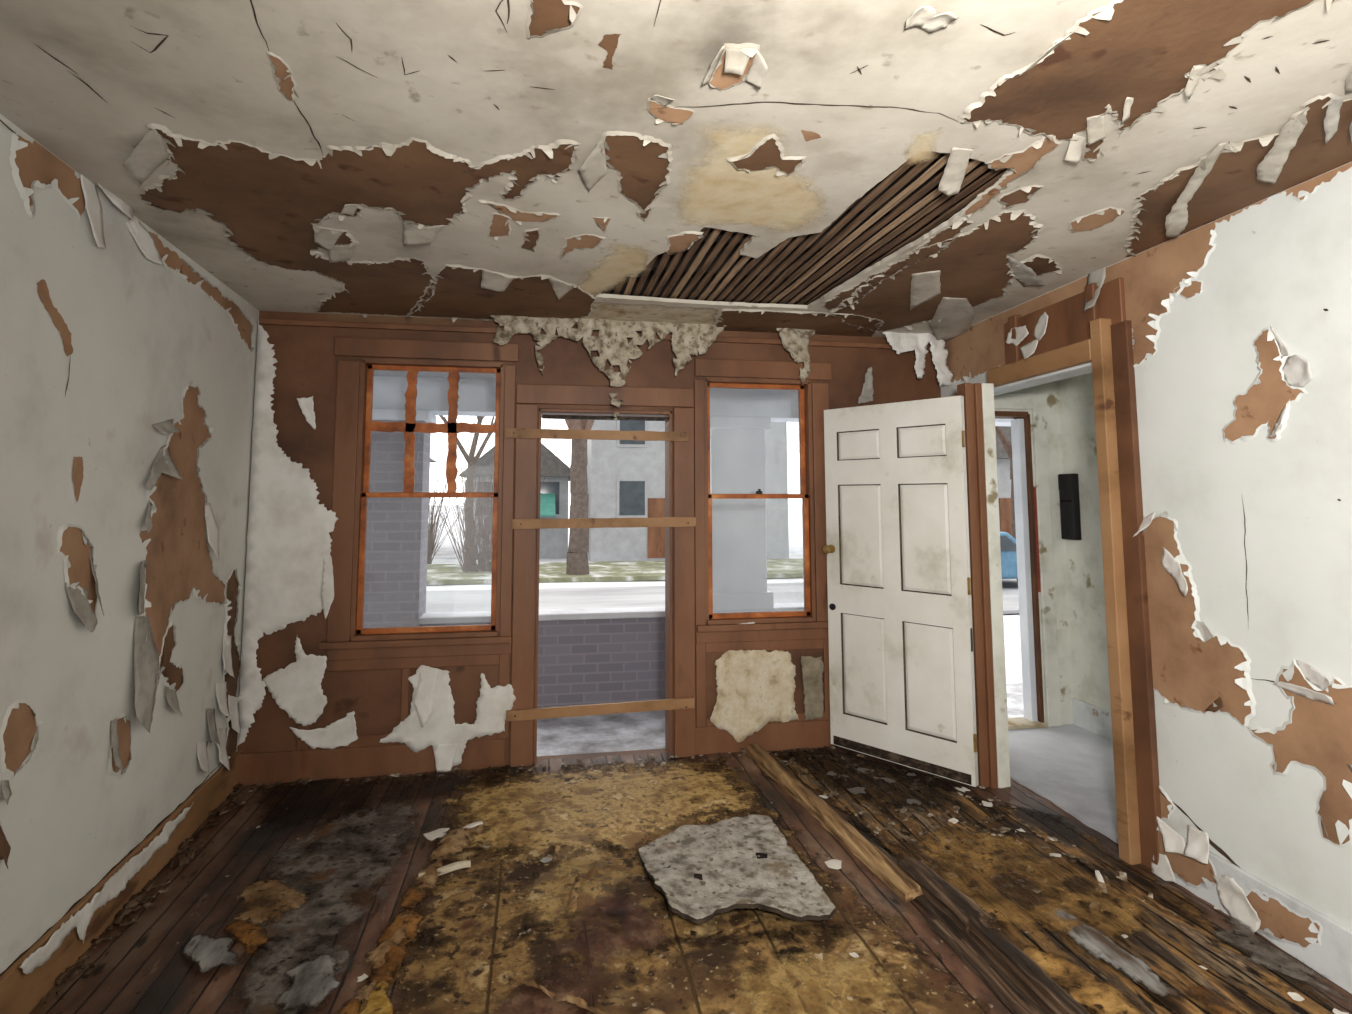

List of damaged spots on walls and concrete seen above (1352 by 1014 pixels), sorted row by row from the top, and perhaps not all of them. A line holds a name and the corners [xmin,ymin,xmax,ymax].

peeling [9,0,1352,779]
peeling [0,699,43,805]
peeling [1133,511,1352,848]
peeling [0,822,11,868]
peeling [1151,785,1323,951]